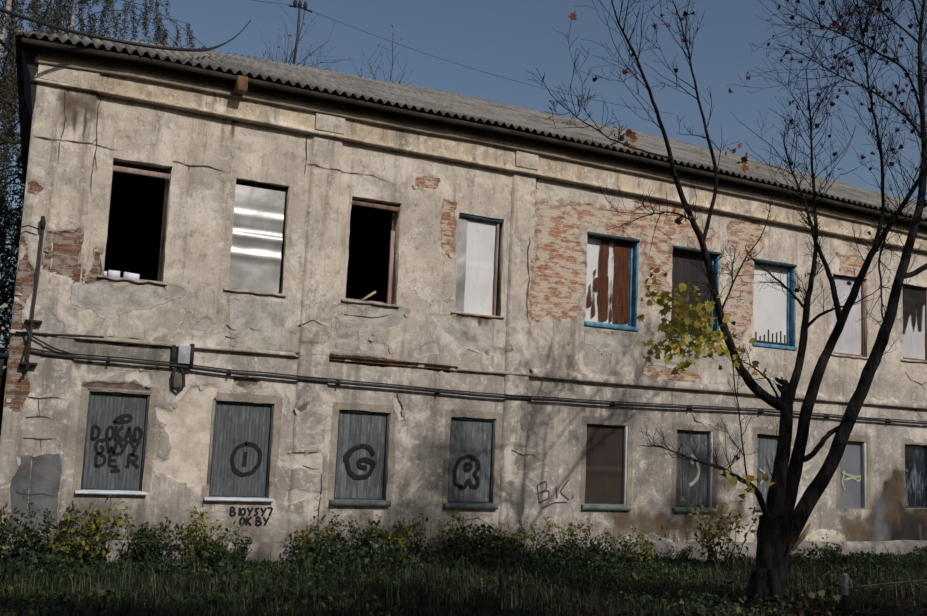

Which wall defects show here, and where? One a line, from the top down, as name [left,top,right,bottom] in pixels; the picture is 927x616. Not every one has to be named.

crack [35,87,129,195]
flaking render [0,229,186,412]
crack [173,161,225,173]
flaking render [412,176,440,190]
flaking render [440,200,457,259]
flaking render [527,191,715,322]
flaking render [720,216,769,341]
flaking render [152,385,218,487]
water stain [845,470,927,541]